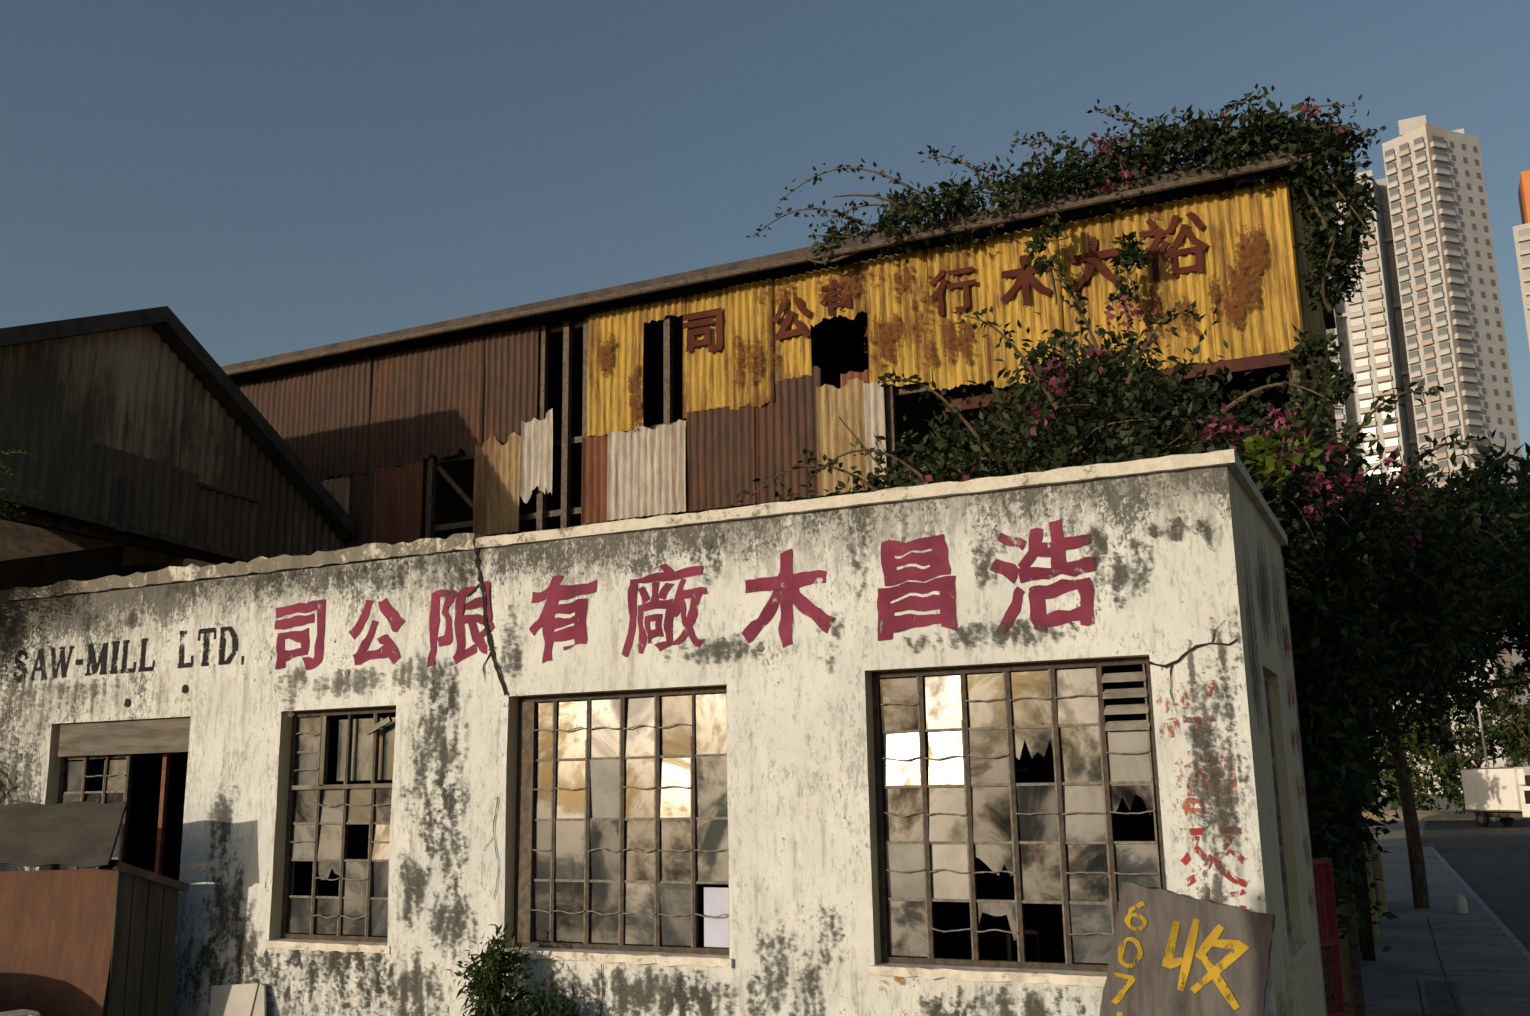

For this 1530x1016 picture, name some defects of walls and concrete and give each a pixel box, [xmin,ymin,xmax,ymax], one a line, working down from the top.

rust [1133,224,1269,348]
rust [592,333,643,433]
rust [719,330,777,389]
leakage [972,533,1005,590]
leakage [1081,517,1220,608]
crack [462,537,507,696]
crack [1148,620,1238,716]
leakage [241,659,477,1016]
leakage [535,908,844,1016]
leakage [919,984,1085,1016]